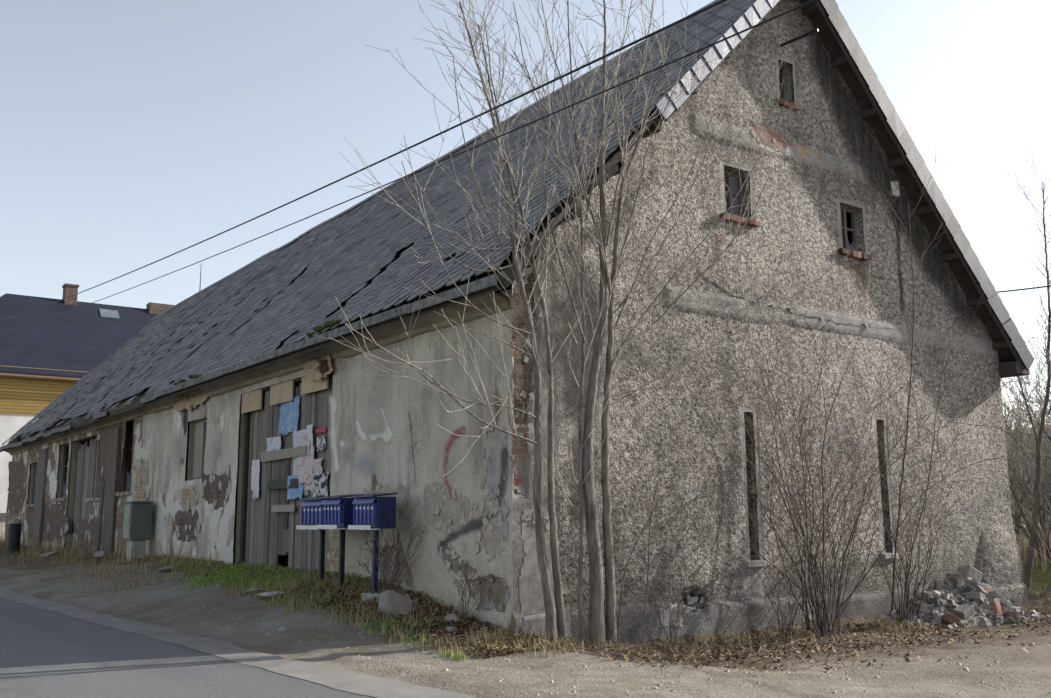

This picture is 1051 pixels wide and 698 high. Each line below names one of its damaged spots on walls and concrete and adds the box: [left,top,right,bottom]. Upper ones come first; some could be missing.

crack [696,271,891,330]
flaking render [7,458,104,552]
flaking render [173,464,231,542]
flaking render [363,482,409,519]